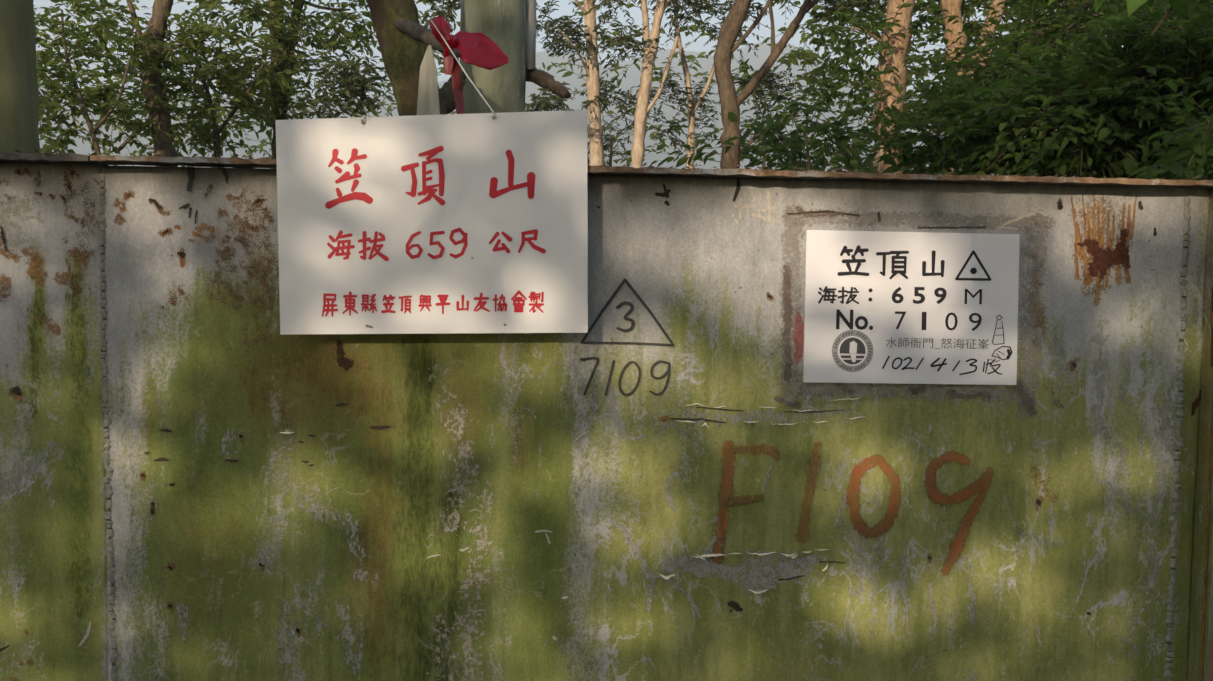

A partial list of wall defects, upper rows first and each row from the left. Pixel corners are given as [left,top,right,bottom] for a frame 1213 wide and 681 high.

corrosion [1056,191,1144,306]
corrosion [0,165,279,617]
peeling [645,398,865,436]
peeling [610,518,846,618]